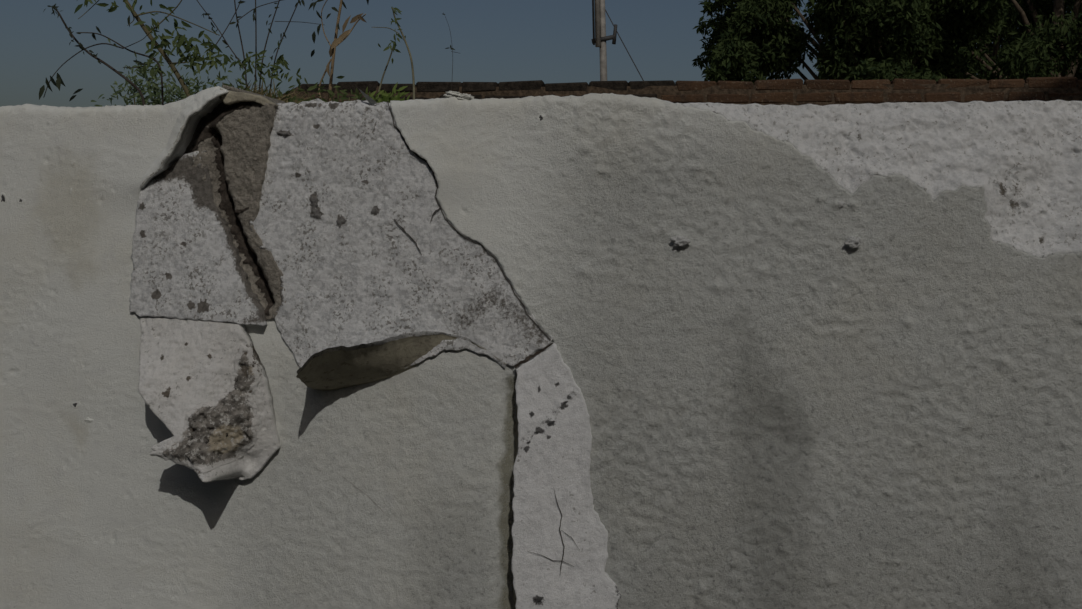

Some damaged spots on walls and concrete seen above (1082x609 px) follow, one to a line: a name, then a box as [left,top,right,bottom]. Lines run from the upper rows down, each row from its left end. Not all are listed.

peeling [129,84,286,482]
crack [191,102,275,315]
spalling [680,100,1082,258]
peeling [512,343,621,609]